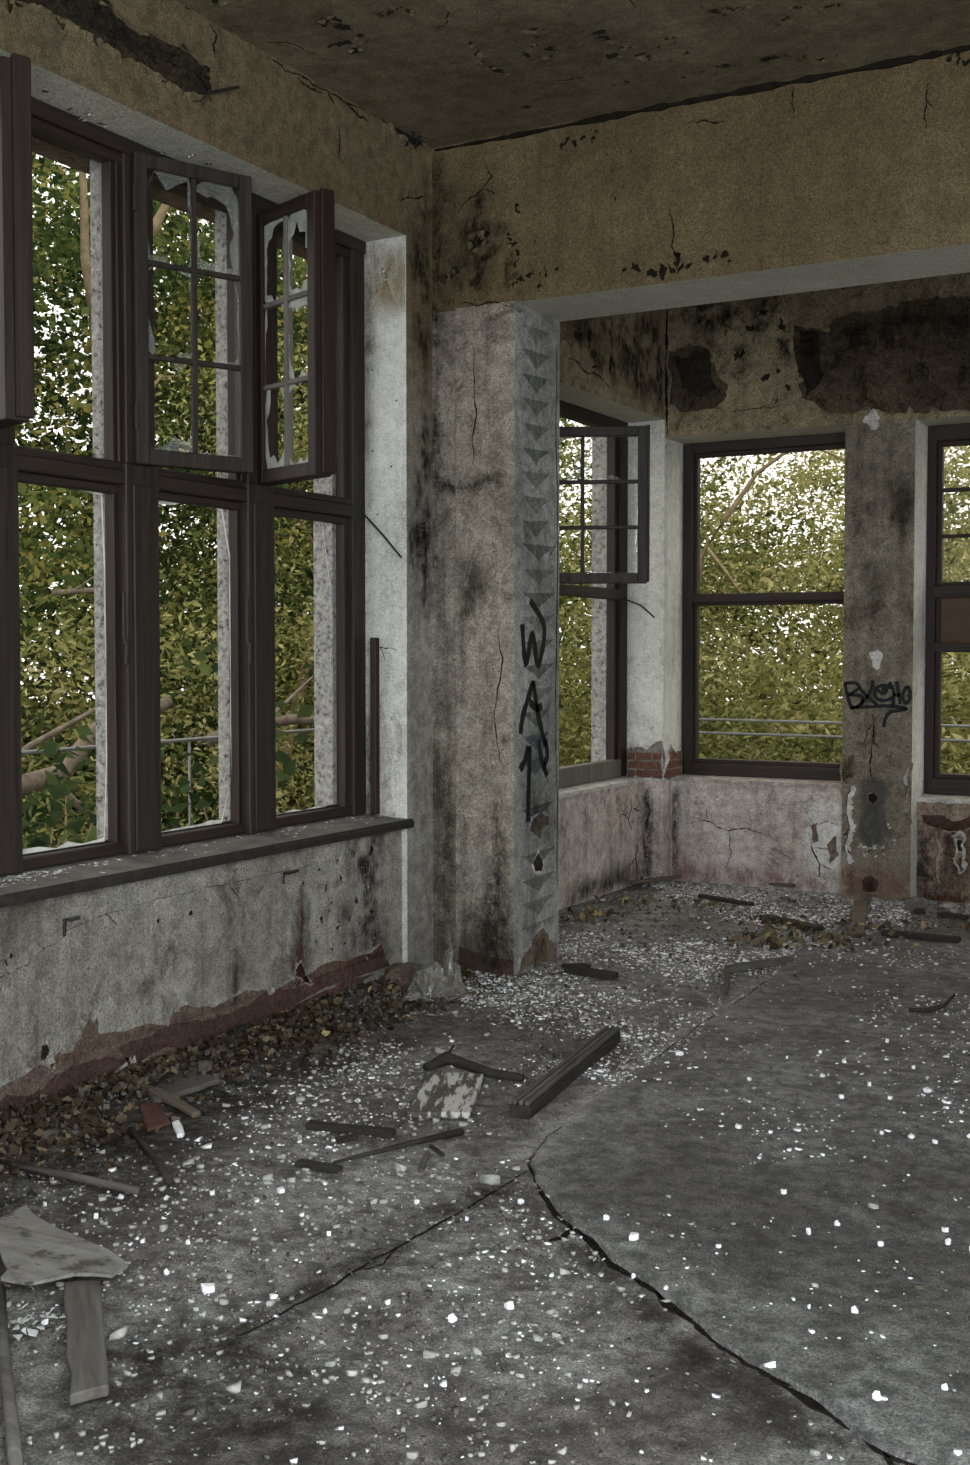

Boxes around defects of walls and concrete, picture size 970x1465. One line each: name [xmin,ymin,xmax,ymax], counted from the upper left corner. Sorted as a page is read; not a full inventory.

spalling [5,0,213,101]
crack [434,45,970,214]
damp [697,296,790,355]
damp [411,410,438,605]
damp [435,769,514,973]
spalling [626,739,682,784]
peeling [799,751,970,896]
peeling [0,843,391,1113]
crack [622,970,773,1083]
crack [236,1126,917,1465]